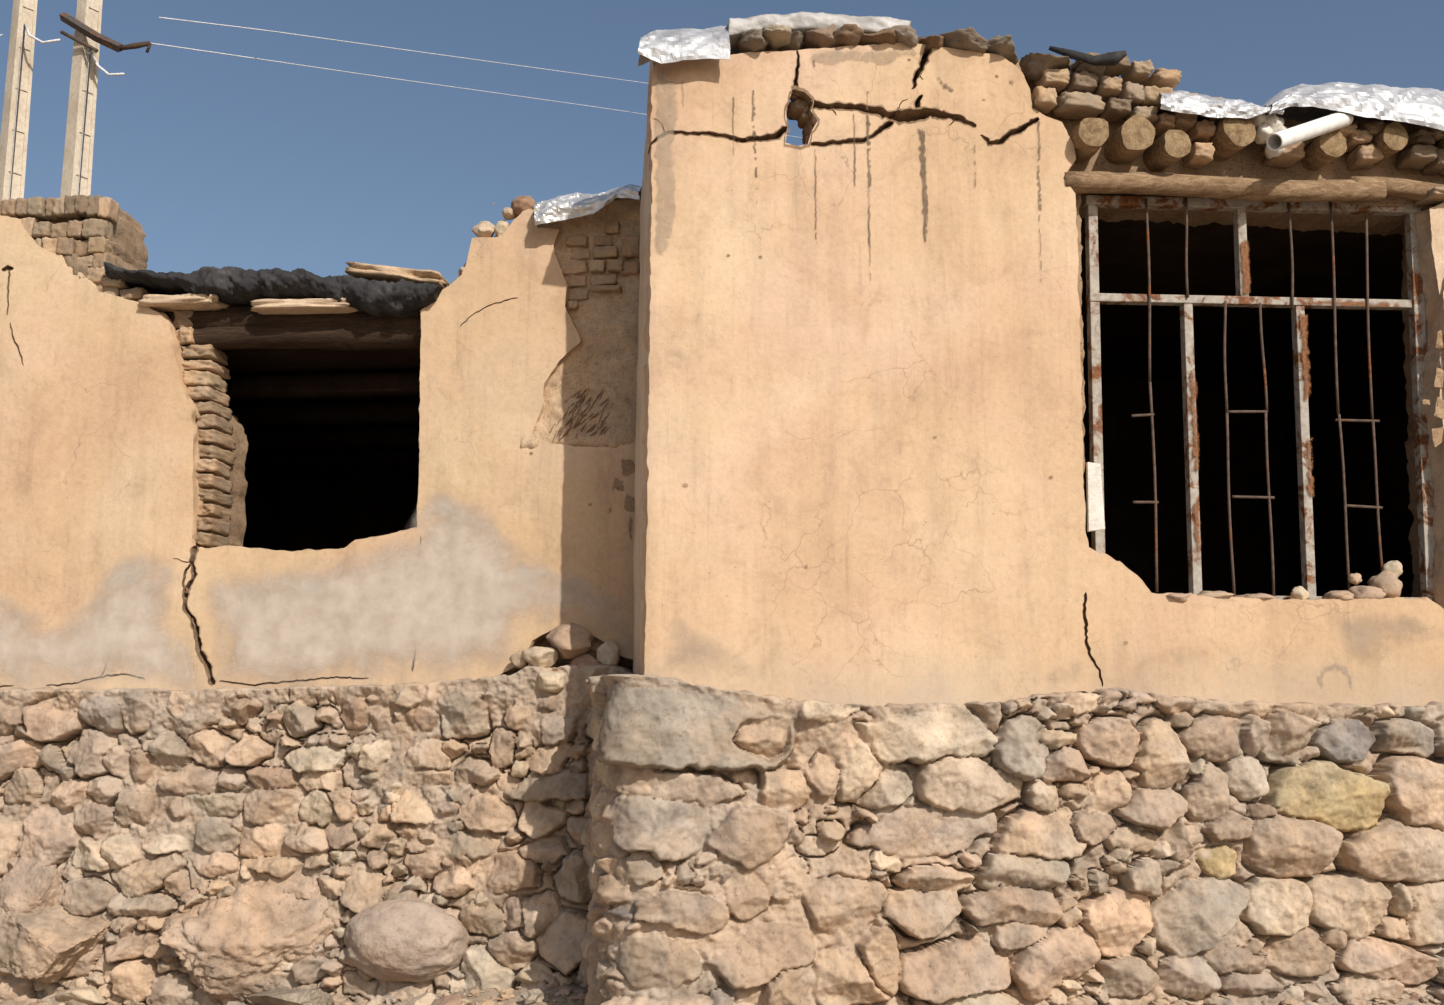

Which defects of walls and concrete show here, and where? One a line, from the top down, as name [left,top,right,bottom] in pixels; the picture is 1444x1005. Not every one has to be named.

crack [648,45,1040,154]
damp [853,91,871,186]
damp [919,129,928,241]
crack [2,265,24,365]
spalling [520,199,641,540]
rust [1241,240,1251,294]
rust [1299,301,1399,400]
spalling [172,310,237,547]
rust [1190,371,1199,470]
rust [1193,503,1201,547]
crack [173,546,369,686]
crack [1082,592,1103,686]